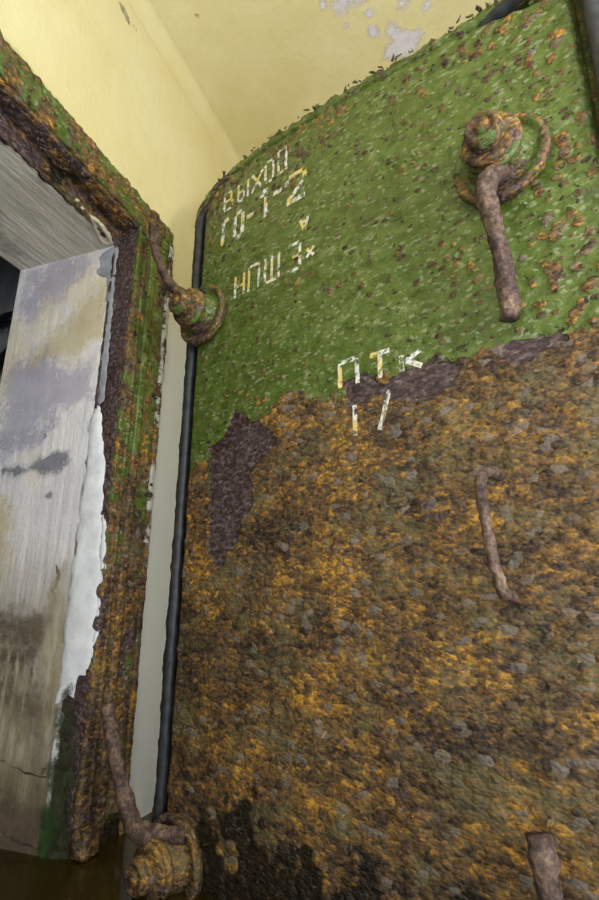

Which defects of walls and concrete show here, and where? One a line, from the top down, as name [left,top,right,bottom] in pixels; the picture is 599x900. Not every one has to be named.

peeling [319,0,432,75]
peeling [445,0,498,34]
leakage [2,293,104,450]
peeling [74,198,119,405]
leakage [0,570,63,767]